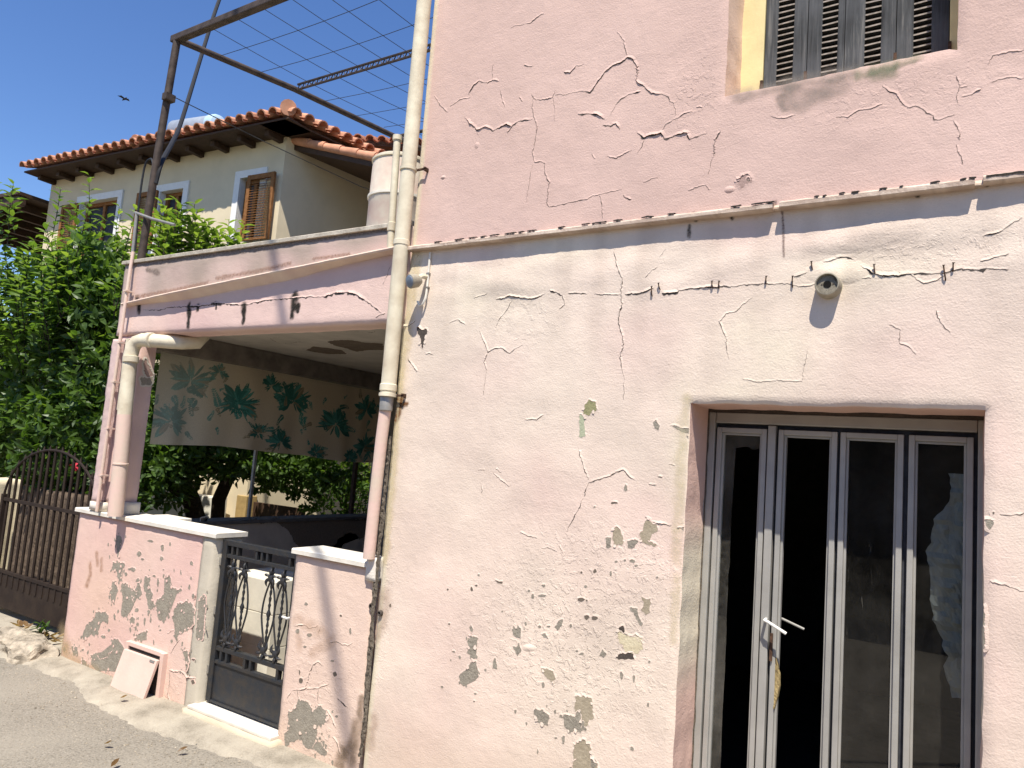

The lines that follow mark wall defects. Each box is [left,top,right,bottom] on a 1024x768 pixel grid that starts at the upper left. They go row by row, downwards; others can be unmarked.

crack [434,31,721,218]
crack [836,48,1024,164]
leakage [187,303,221,328]
crack [143,265,416,333]
leakage [290,292,300,319]
crack [449,216,1023,400]
crack [520,448,675,554]
peeling [62,533,208,685]
flaking render [511,516,660,657]
peeling [449,624,498,703]
peeling [284,698,339,765]
flaking render [513,693,600,768]